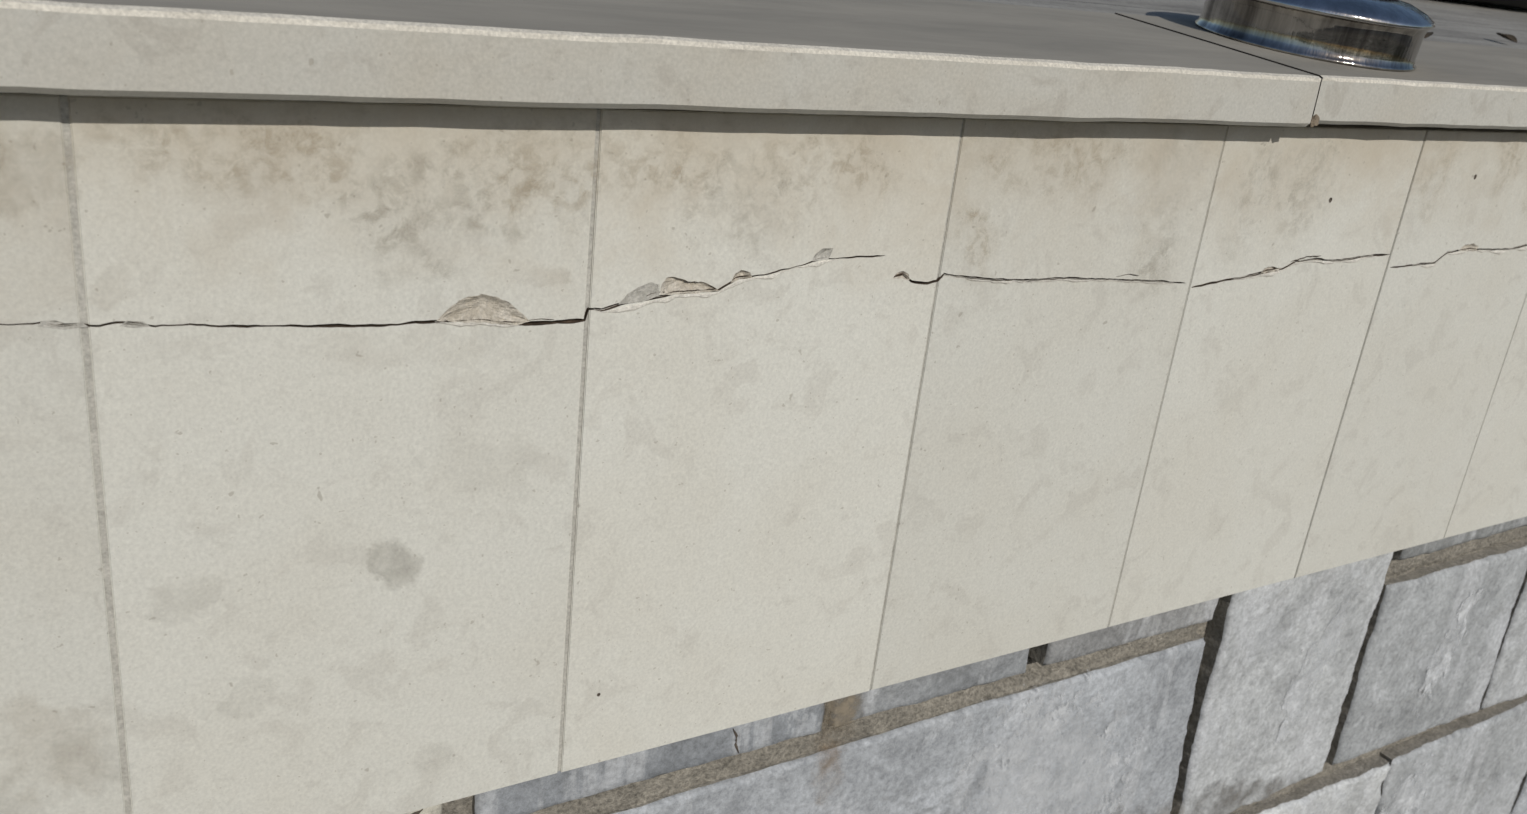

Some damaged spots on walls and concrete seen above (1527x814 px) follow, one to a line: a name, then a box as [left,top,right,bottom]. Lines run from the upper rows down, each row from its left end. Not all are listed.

crack [0,244,1527,328]